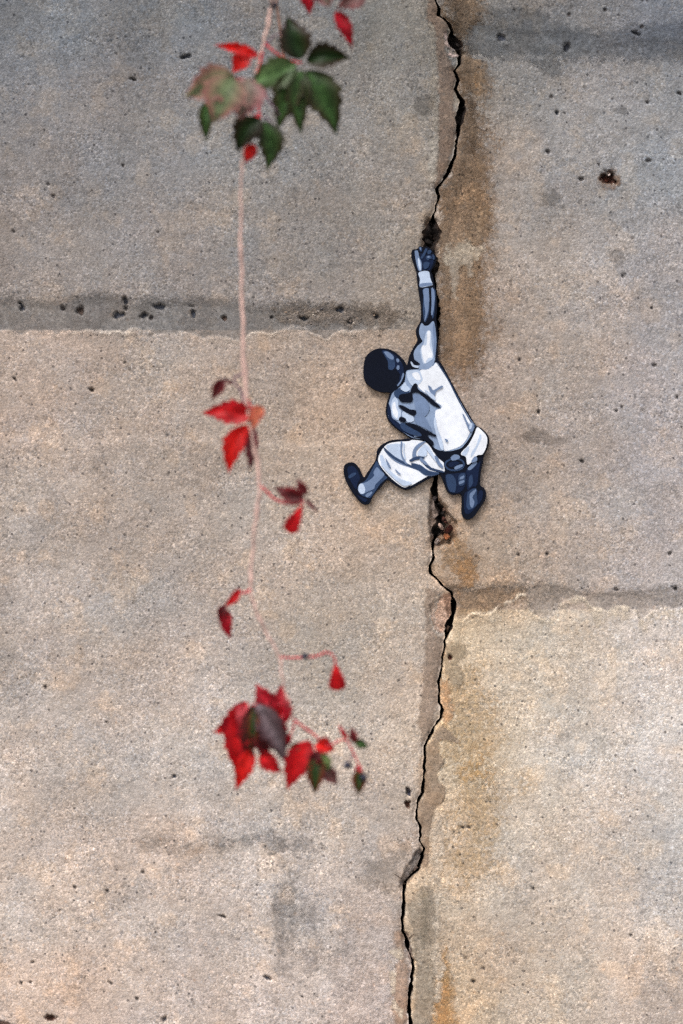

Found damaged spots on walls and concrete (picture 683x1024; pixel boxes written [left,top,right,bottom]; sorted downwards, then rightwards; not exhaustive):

leakage [416,0,456,186]
crack [404,0,487,341]
leakage [444,239,483,298]
rust [598,170,620,189]
crack [395,475,457,1024]